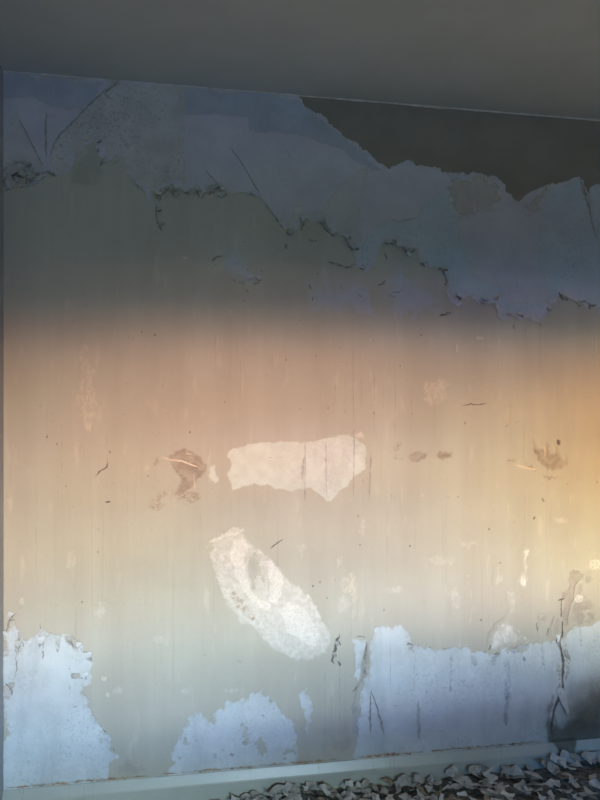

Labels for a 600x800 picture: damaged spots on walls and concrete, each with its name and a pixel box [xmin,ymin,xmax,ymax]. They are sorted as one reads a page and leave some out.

peeling [3,72,600,323]
leakage [150,445,210,499]
peeling [3,611,119,790]
peeling [168,688,313,776]
peeling [353,560,600,759]
crack [550,598,571,739]